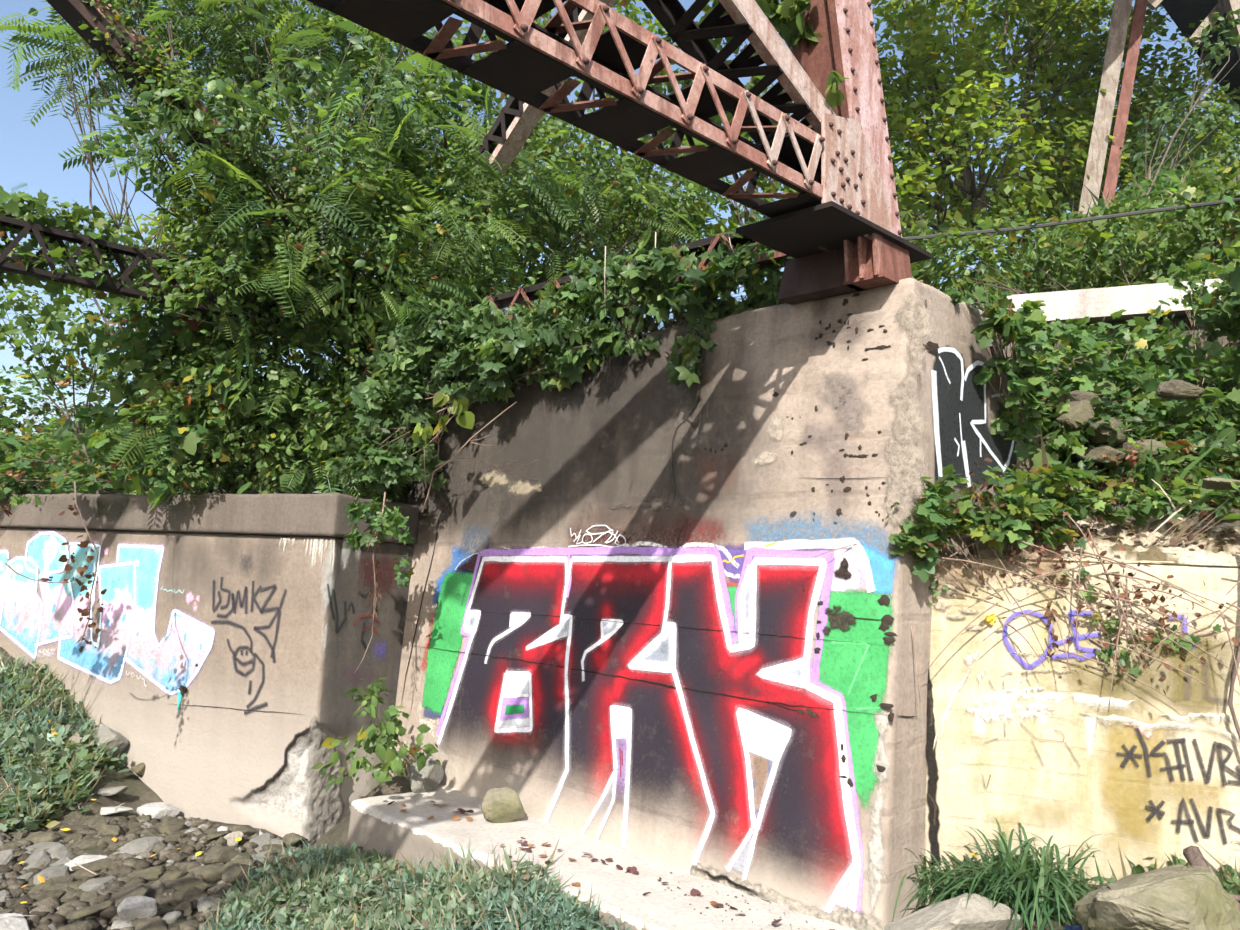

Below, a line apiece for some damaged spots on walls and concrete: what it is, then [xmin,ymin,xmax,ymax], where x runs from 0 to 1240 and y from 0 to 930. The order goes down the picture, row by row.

crack [669,356,705,493]
leakage [933,638,1240,749]
spalling [244,717,344,845]
crack [898,669,941,865]